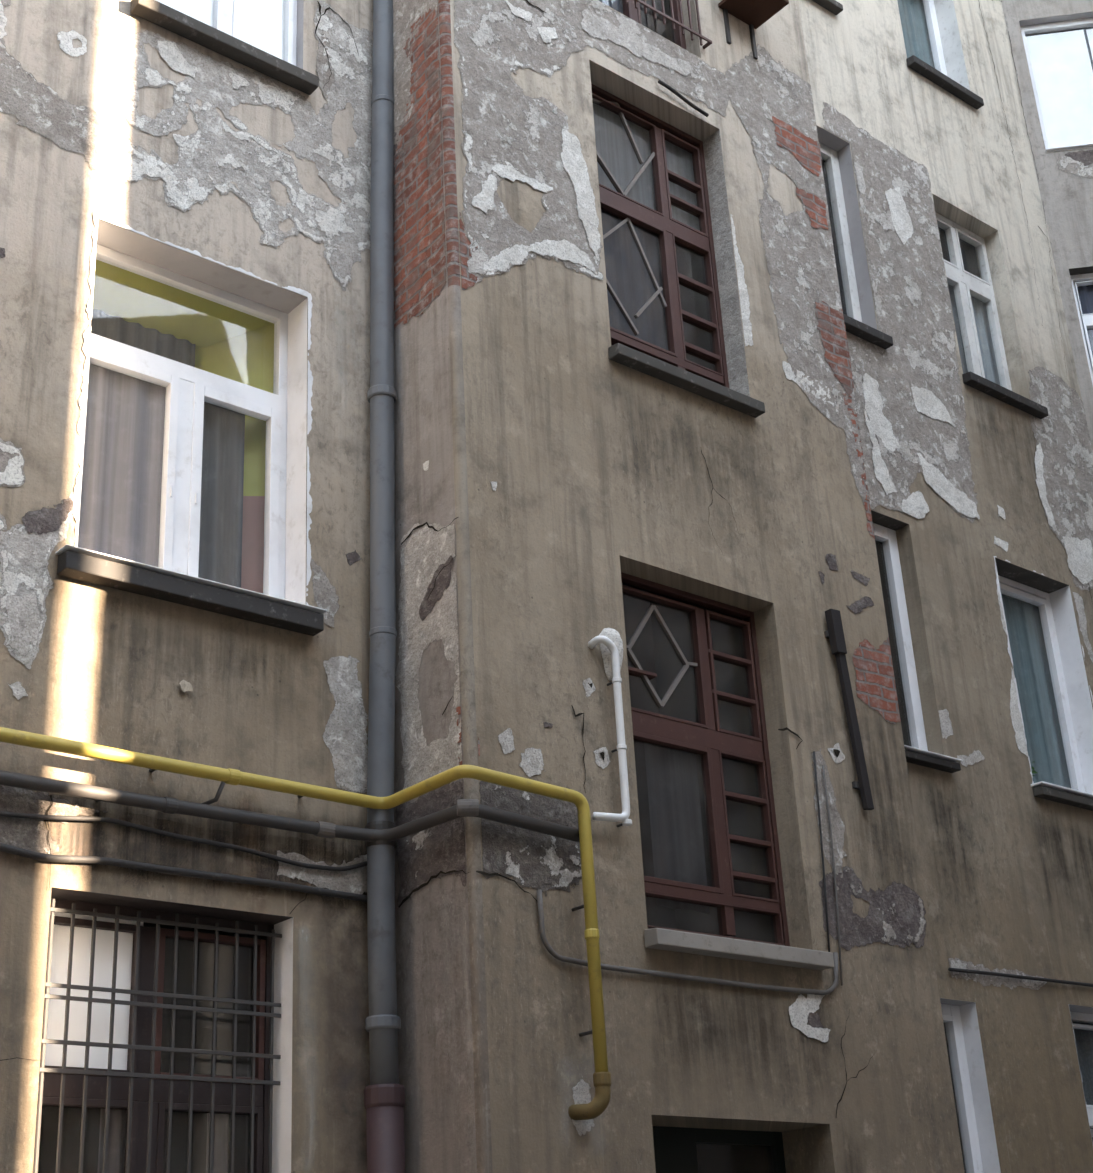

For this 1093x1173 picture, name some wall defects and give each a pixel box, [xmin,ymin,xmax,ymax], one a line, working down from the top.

peeling [0,0,373,291]
flaking render [393,0,446,329]
peeling [454,0,980,539]
peeling [0,437,26,488]
peeling [0,492,74,669]
peeling [322,656,368,794]
peeling [395,523,466,907]
flaking render [852,637,901,724]
peeling [1028,366,1093,662]
spalling [479,781,582,896]
spalling [811,743,927,951]
spalling [948,957,1047,990]